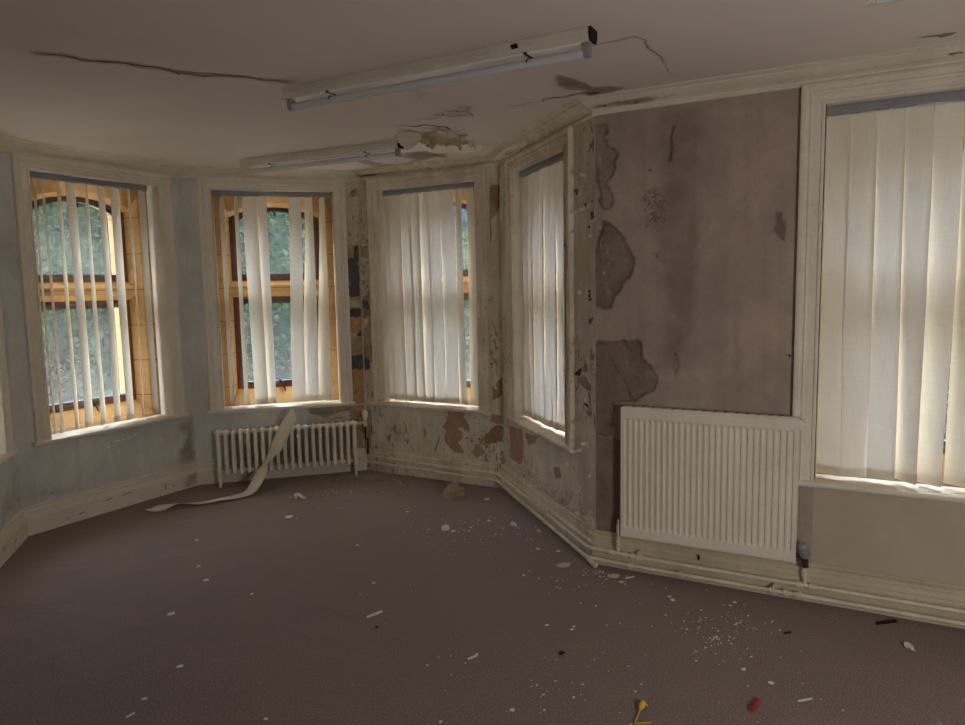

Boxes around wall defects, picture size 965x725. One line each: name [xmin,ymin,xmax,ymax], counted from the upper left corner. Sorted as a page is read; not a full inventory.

crack [37,53,284,82]
crack [594,36,672,75]
peeling [395,124,483,154]
peeling [433,358,595,530]